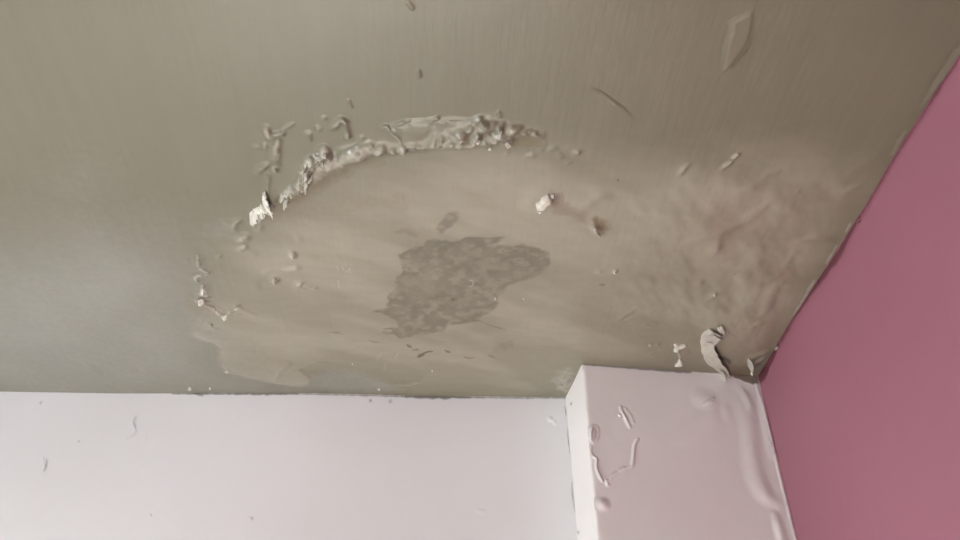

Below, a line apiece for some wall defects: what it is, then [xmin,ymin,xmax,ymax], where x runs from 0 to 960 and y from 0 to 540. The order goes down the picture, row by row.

peeling [249,144,408,227]
flaking render [536,193,555,214]
peeling [193,254,243,331]
damp [372,210,551,339]
peeling [674,325,797,540]